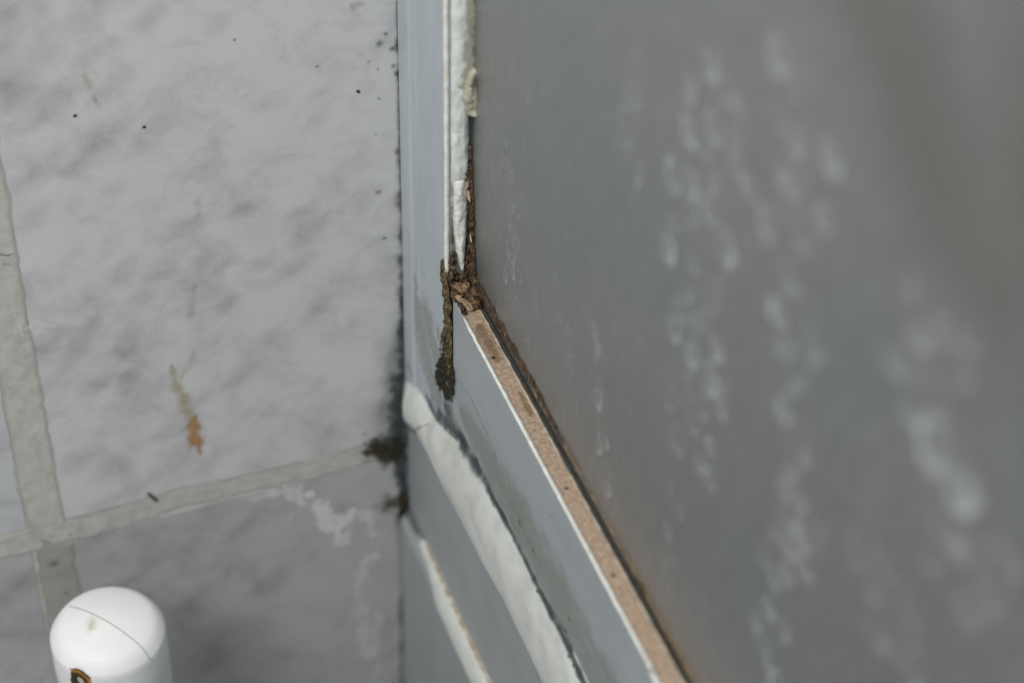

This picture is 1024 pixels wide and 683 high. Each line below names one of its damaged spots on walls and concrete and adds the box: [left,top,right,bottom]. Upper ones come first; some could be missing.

rust [189,416,202,454]
damp [248,256,424,547]
damp [426,116,696,683]